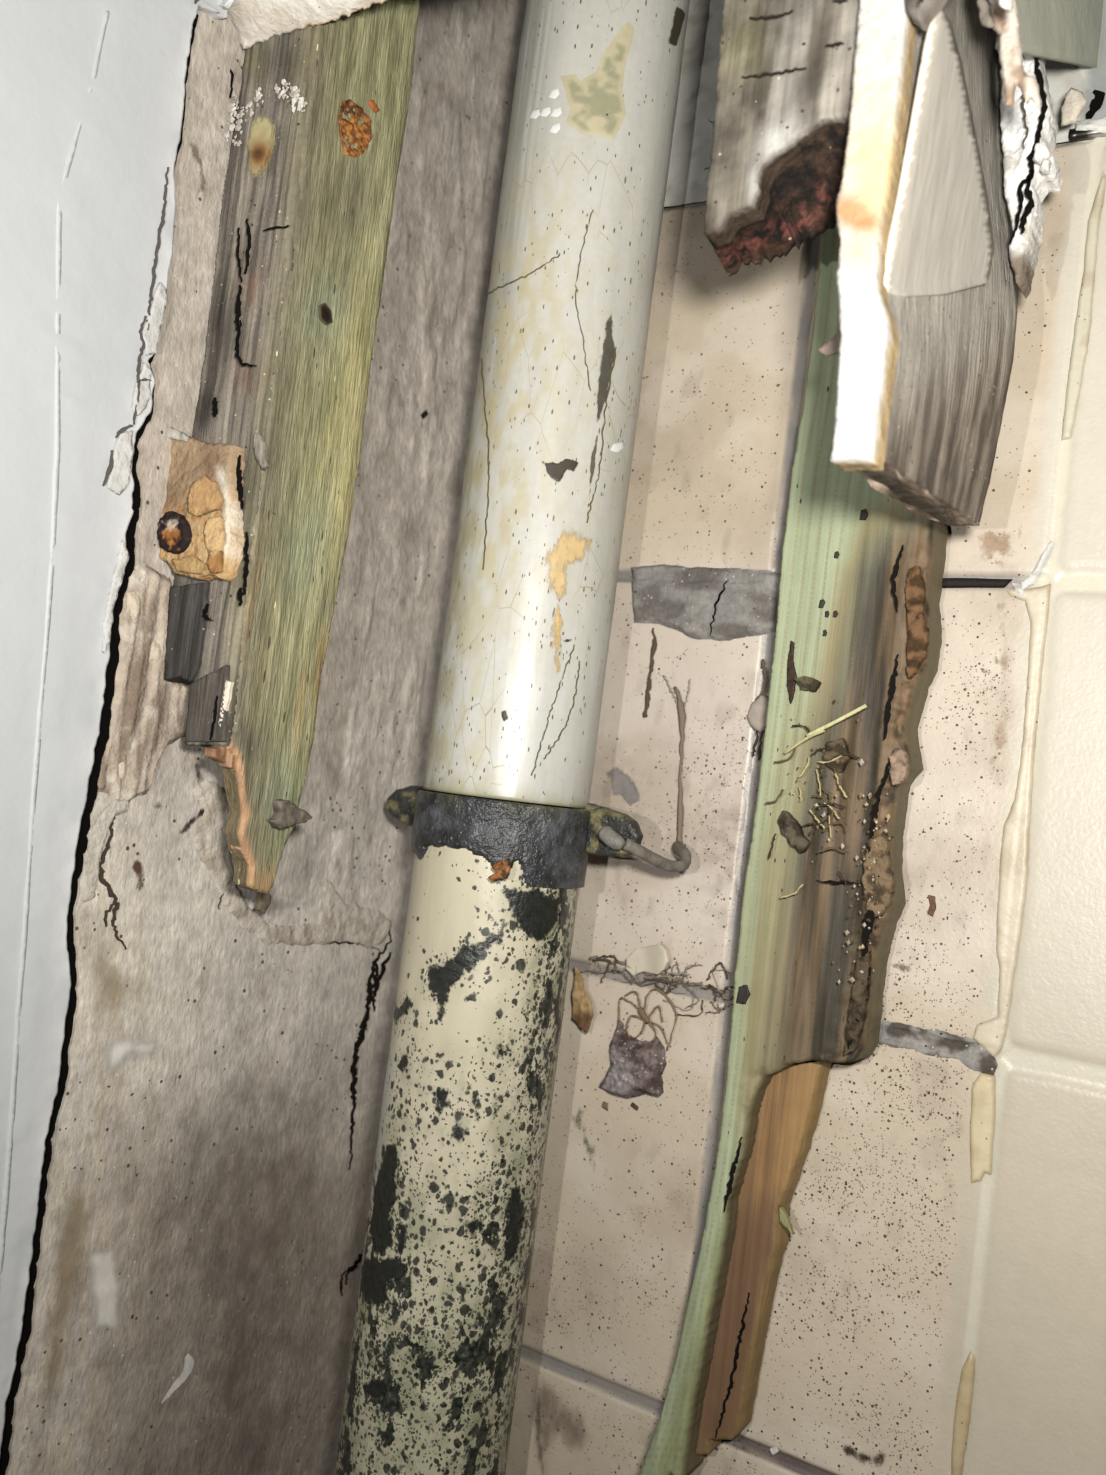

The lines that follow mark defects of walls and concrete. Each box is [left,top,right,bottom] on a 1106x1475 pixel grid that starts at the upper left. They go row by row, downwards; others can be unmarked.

spalling [223,0,387,50]
peeling [530,21,634,140]
flaking render [976,0,1105,299]
peeling [253,434,270,470]
crack [0,0,199,1475]
flaking render [79,563,234,903]
spalling [190,780,405,955]
peeling [625,944,671,976]
crack [328,929,392,1170]
crack [339,1251,363,1296]